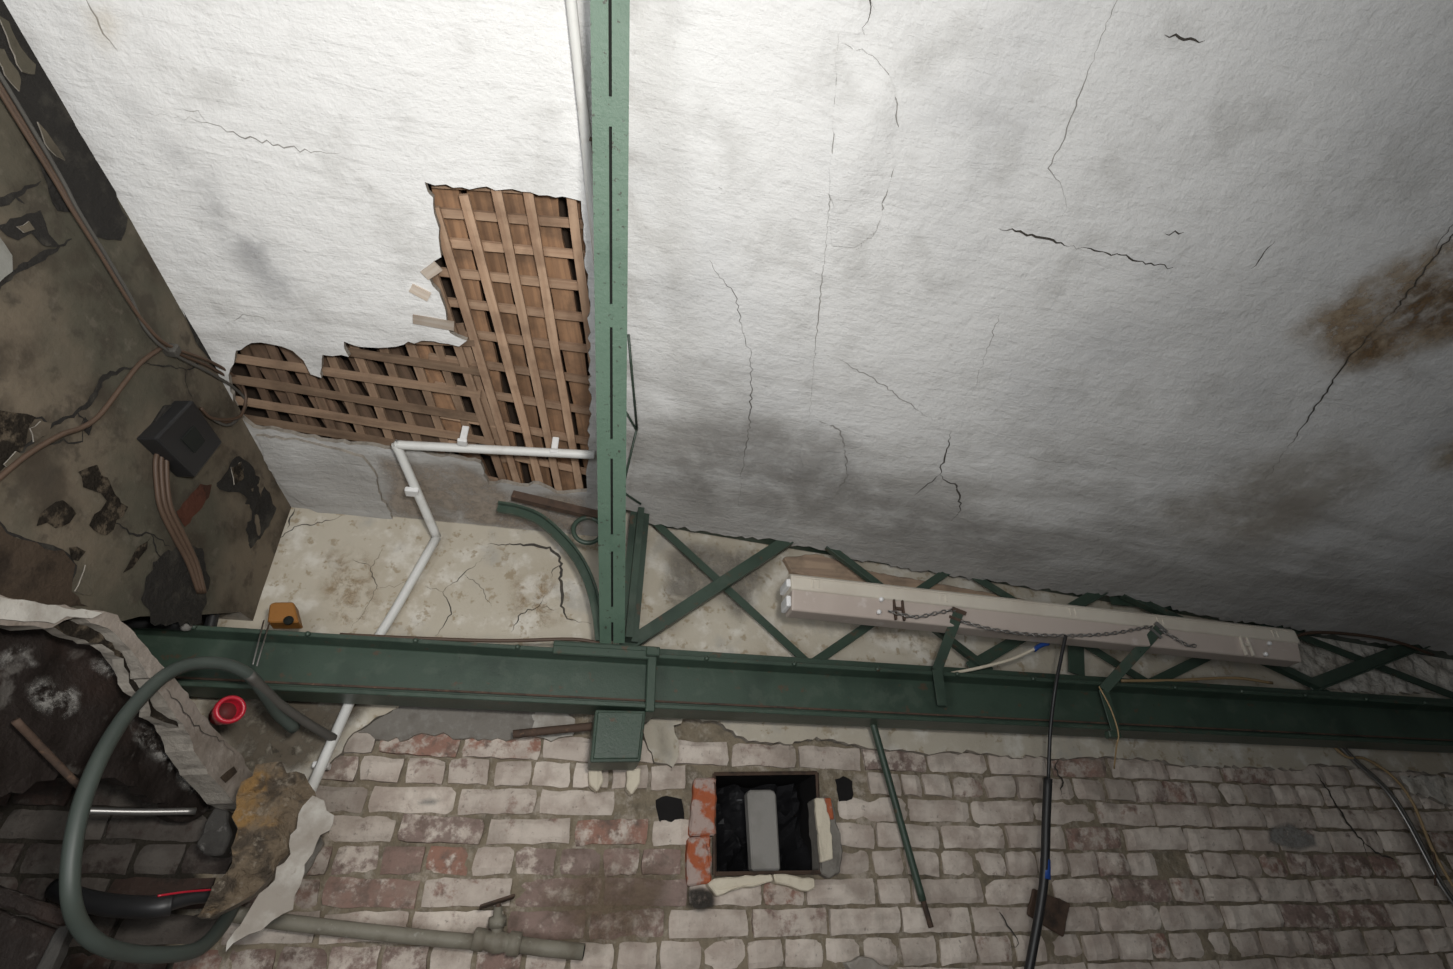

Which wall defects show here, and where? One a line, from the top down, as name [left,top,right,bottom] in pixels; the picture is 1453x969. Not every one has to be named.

crack [1000,1,1183,269]
flaking render [232,184,592,491]
crack [809,196,962,518]
crack [1265,226,1453,478]
water stain [1317,246,1453,367]
crack [354,543,588,631]
spalling [824,776,853,820]